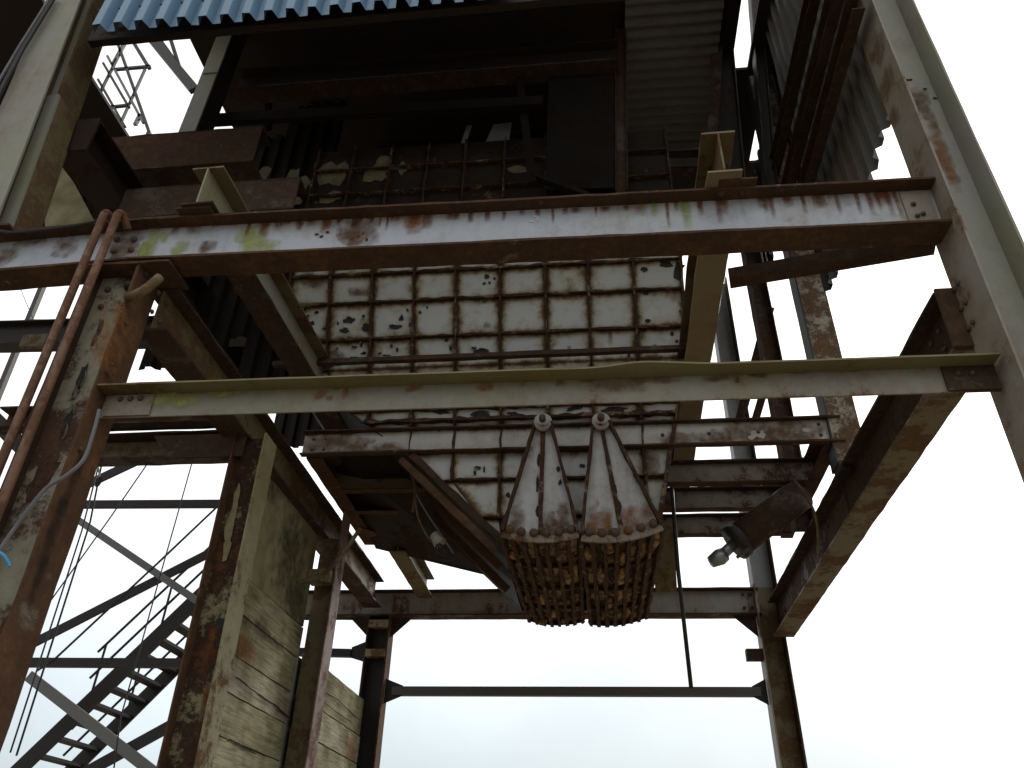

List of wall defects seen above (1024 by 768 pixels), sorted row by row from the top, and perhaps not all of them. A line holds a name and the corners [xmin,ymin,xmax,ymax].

corrosion [913,94,956,180]
peeling [363,156,407,182]
peeling [286,161,349,205]
corrosion [854,191,899,205]
corrosion [297,215,431,228]
peeling [640,260,685,280]
peeling [388,306,428,329]
peeling [303,307,398,358]